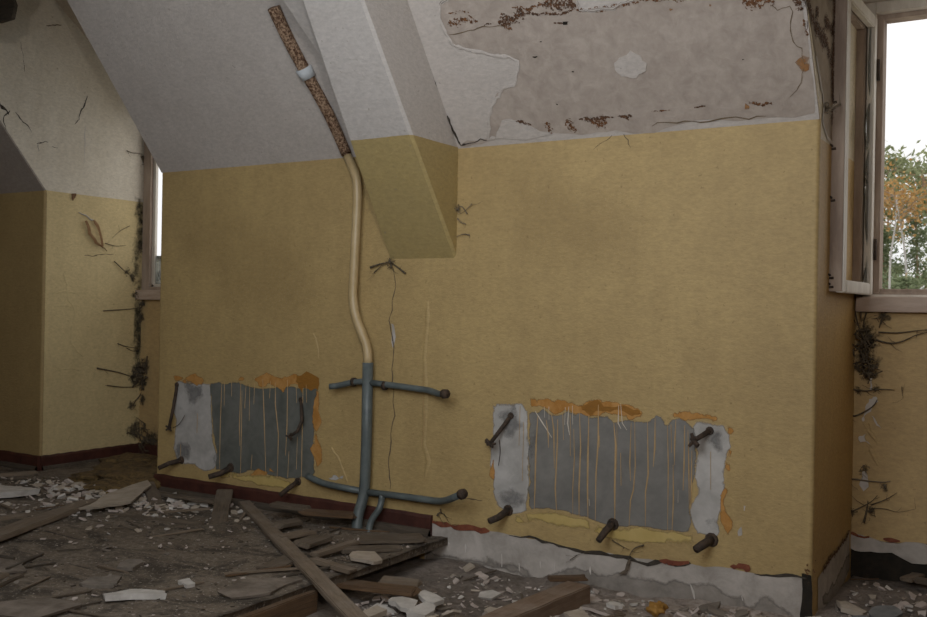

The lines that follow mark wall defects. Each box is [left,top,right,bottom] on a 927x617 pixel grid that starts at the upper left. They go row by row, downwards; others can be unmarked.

crack [0,104,56,149]
peeling [437,0,836,147]
flaking render [425,471,927,617]